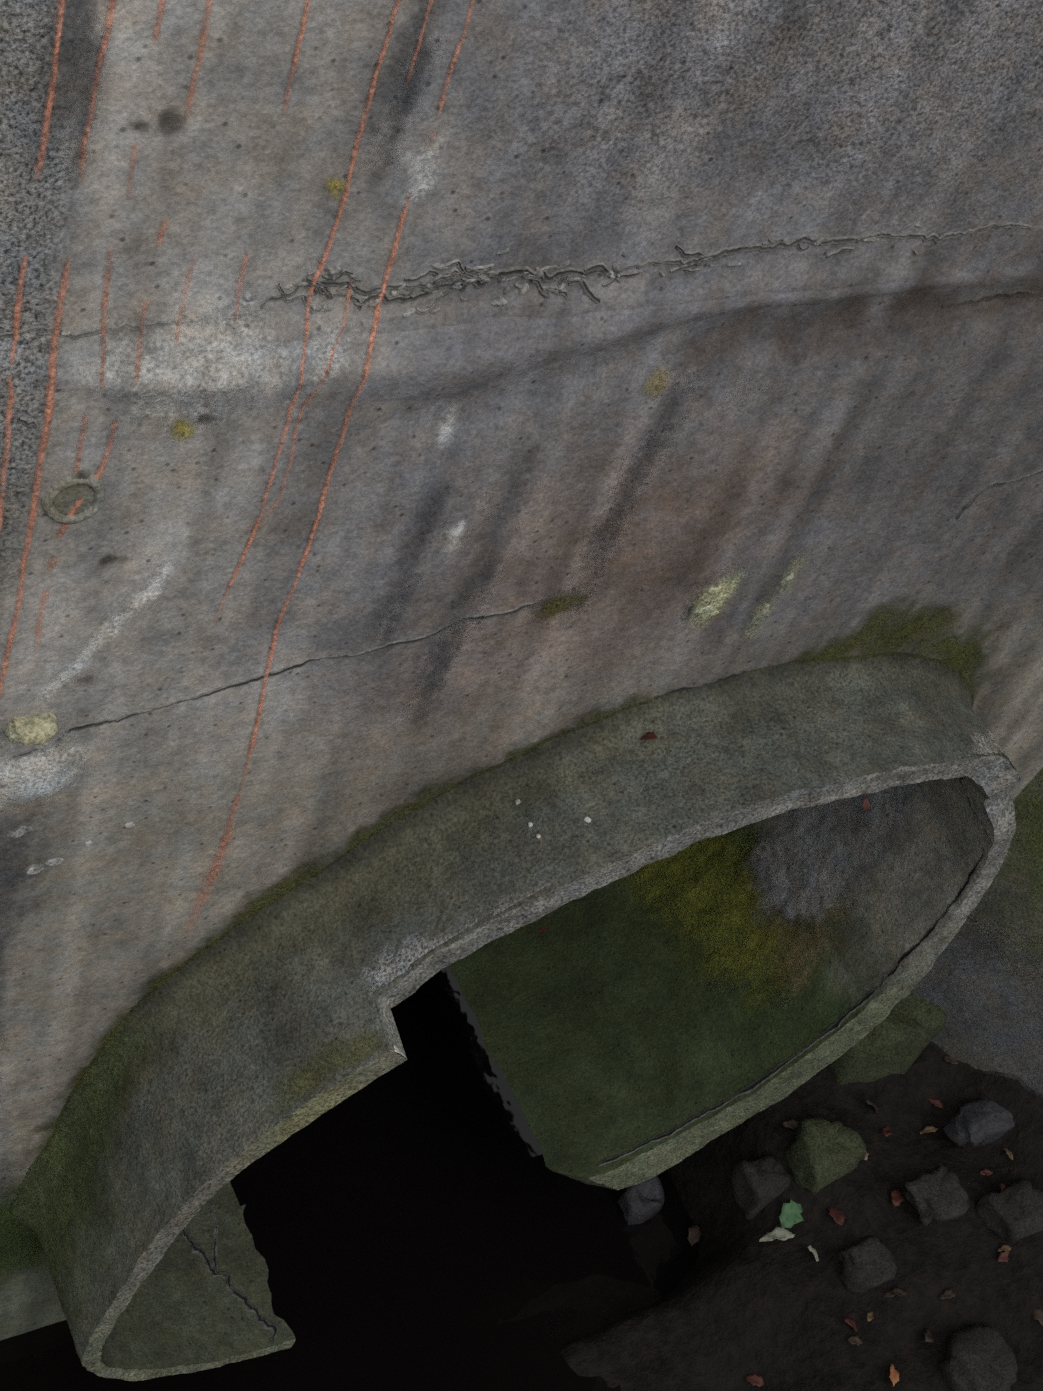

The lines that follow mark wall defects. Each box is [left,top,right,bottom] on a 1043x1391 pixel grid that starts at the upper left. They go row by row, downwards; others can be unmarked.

corrosion [37,0,65,171]
corrosion [81,0,116,161]
corrosion [224,0,400,601]
crack [0,222,1043,340]
corrosion [0,257,70,693]
corrosion [247,196,410,765]
water stain [449,522,464,546]
crack [0,602,537,761]